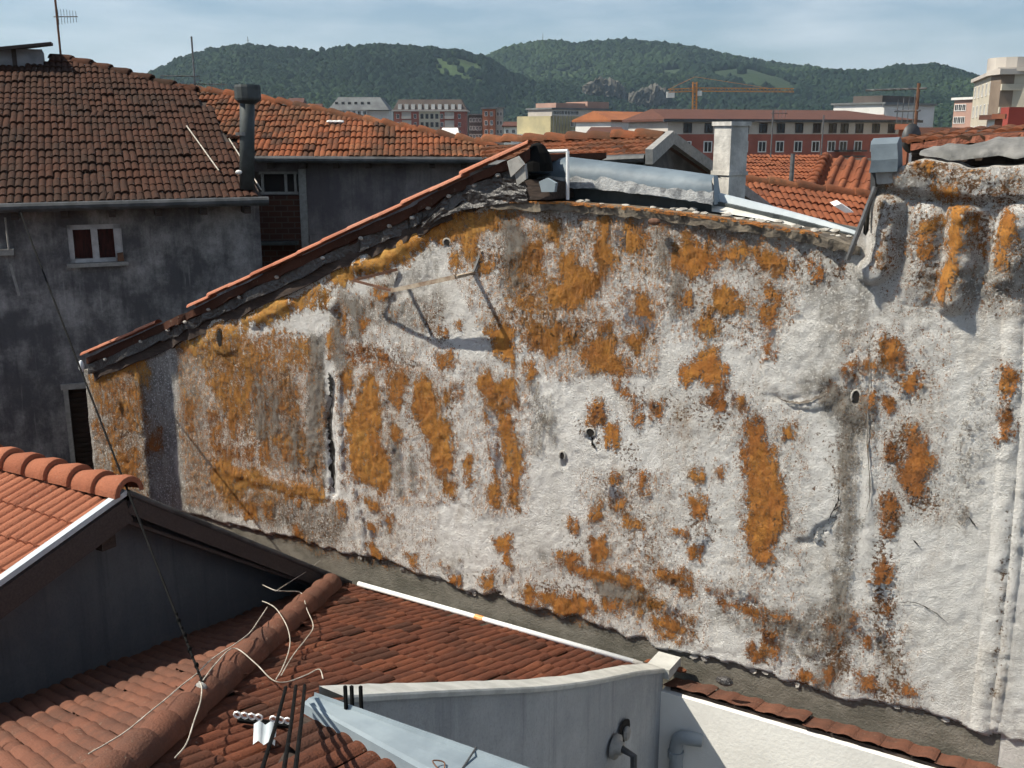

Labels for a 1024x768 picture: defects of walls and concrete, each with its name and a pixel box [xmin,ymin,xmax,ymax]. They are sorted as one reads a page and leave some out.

water stain [88,360,167,497]
crack [327,372,335,492]
water stain [174,160,1024,713]
crack [809,492,841,543]